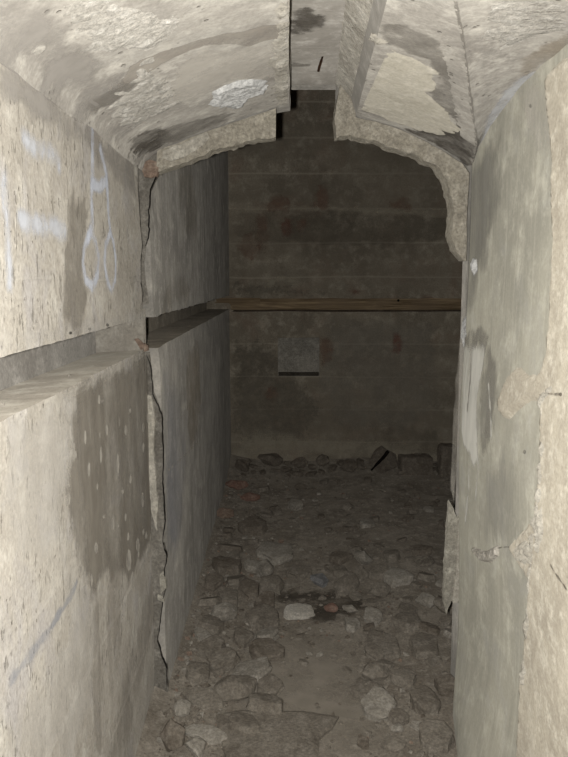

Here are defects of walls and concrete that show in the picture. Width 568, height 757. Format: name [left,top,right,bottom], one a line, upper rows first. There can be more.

spalling [208,0,290,109]
crack [137,160,159,319]
leakage [71,360,151,589]
crack [134,338,168,684]
spalling [497,58,568,757]